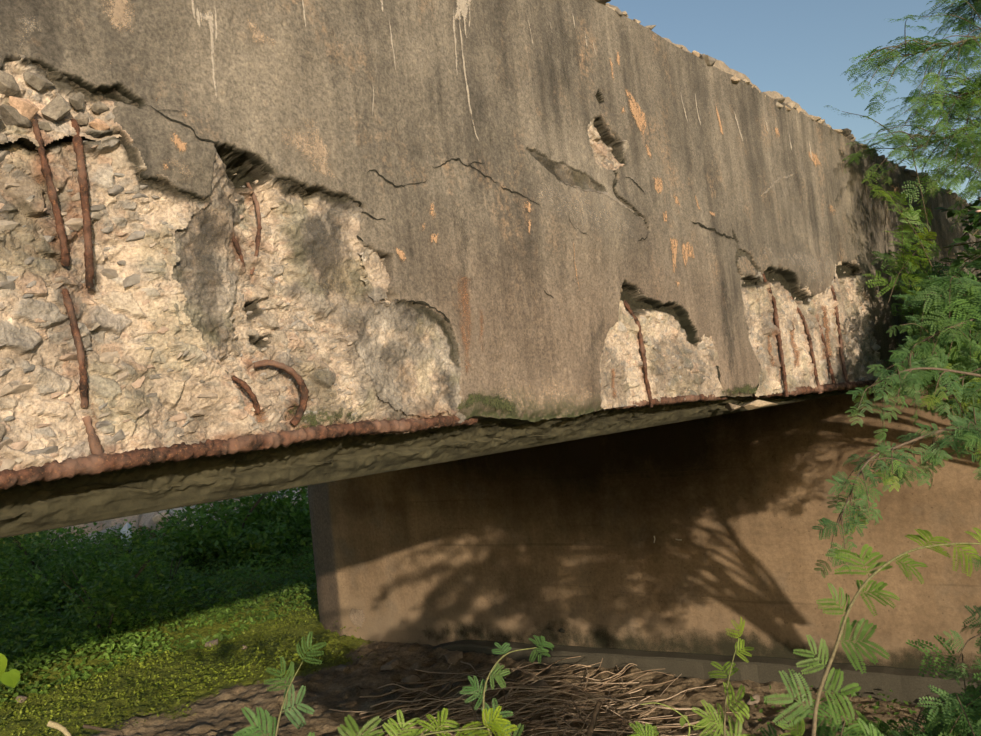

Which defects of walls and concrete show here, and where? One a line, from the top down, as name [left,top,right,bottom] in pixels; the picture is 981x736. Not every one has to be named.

corrosion [71,119,94,288]
crack [148,105,219,143]
spalling [0,54,466,471]
crack [368,158,539,205]
leakage [453,0,479,140]
spalling [587,115,630,170]
crack [693,222,764,284]
corrosion [0,288,478,490]
corrosion [596,300,730,412]
spalling [583,260,891,412]
corrosion [751,272,902,399]
leakage [427,622,981,675]